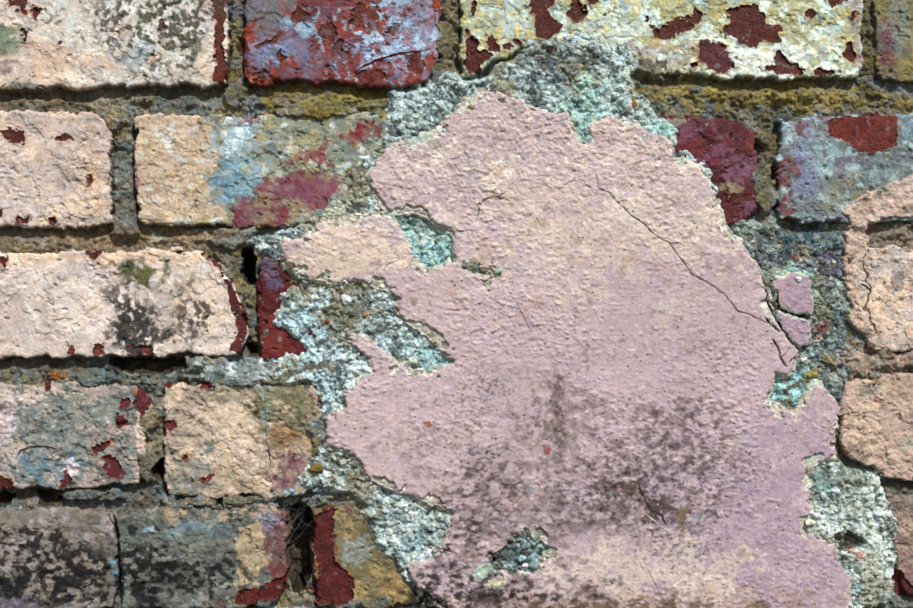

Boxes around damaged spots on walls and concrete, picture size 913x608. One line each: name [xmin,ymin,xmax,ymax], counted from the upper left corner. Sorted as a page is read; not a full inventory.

peeling [237,30,287,63]
peeling [690,3,835,76]
peeling [843,42,856,62]
peeling [0,127,25,146]
spalling [246,0,719,287]
peeling [828,112,898,153]
crack [596,177,806,367]
spalling [727,211,866,410]
crack [861,250,913,354]
spalling [207,255,453,607]
spalling [492,529,548,575]
spalling [801,461,913,608]